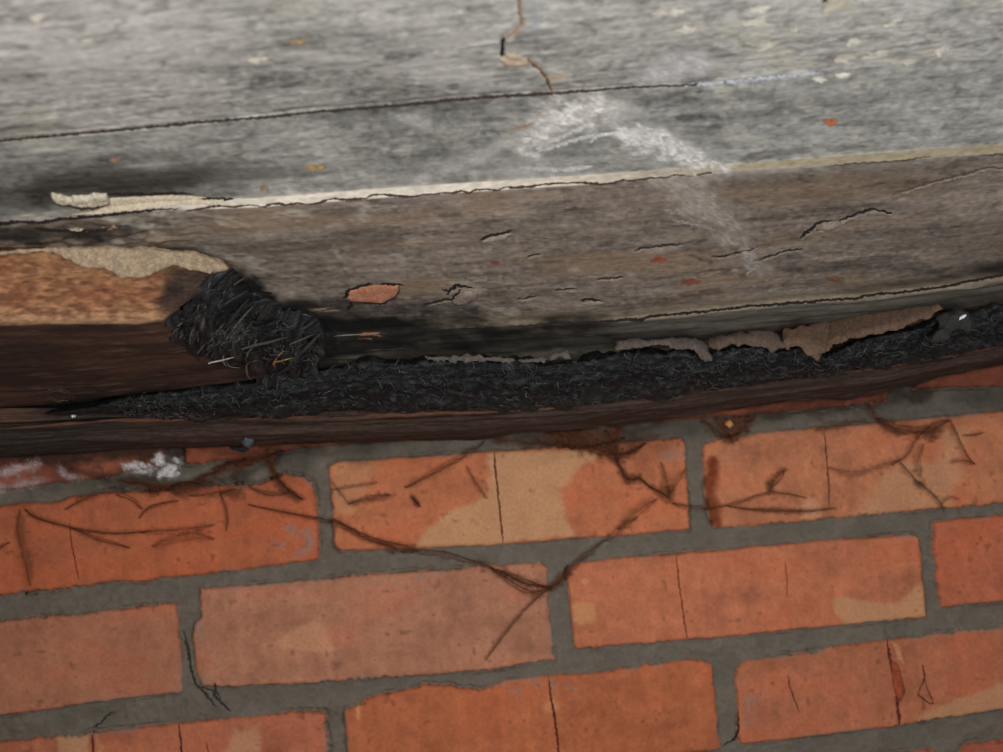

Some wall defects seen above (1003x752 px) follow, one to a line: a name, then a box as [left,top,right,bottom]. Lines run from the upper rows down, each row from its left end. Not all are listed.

crack [0,0,697,142]
crack [0,172,712,226]
crack [712,153,1003,263]
crack [635,243,681,252]
spalling [313,282,405,312]
peeling [424,349,571,363]
peeling [615,303,943,362]
leakage [0,448,185,493]
crack [493,453,504,543]
crack [183,630,231,712]
crack [548,676,560,752]
crack [887,639,905,725]